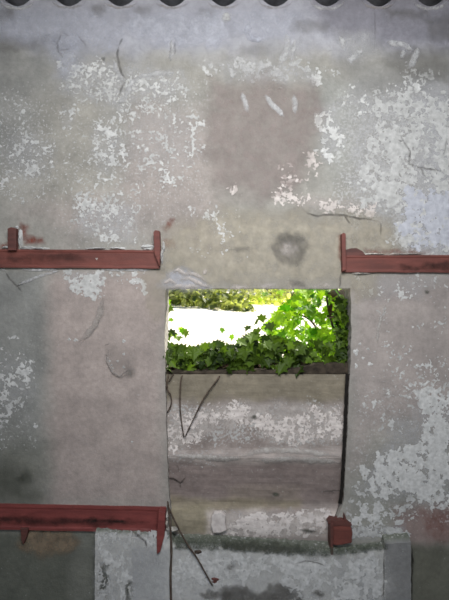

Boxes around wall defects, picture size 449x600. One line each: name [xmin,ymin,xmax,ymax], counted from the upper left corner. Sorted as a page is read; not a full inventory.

peeling [62,268,148,301]
peeling [49,53,208,247]
peeling [188,205,241,255]
peeling [270,61,449,255]
peeling [0,352,35,440]
peeling [346,341,449,539]